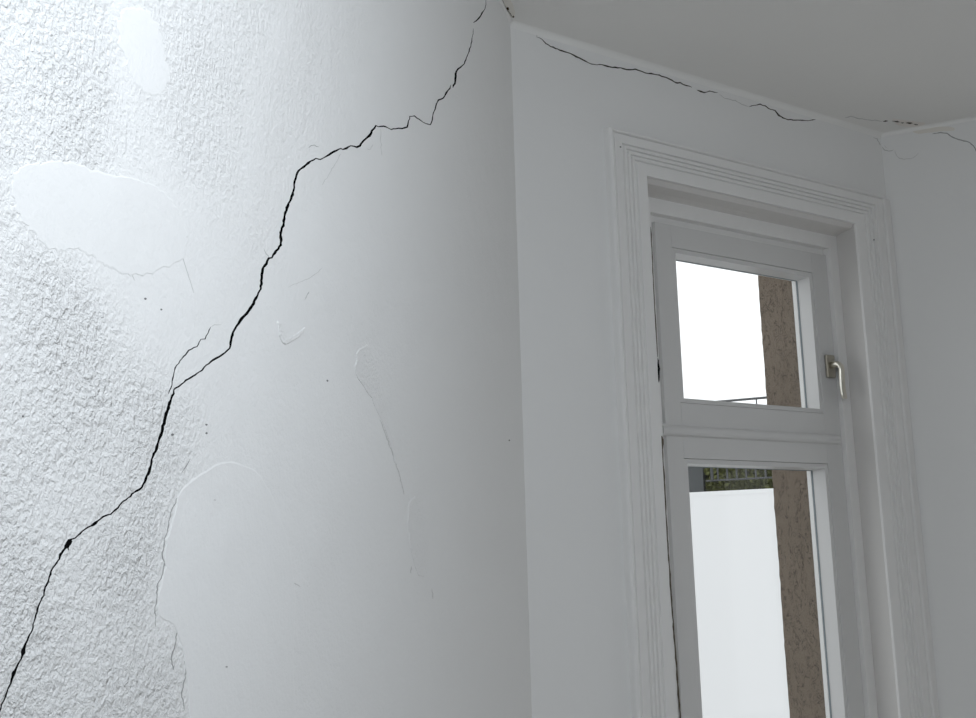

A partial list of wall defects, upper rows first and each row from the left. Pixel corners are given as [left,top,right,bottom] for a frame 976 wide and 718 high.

crack [536,35,815,121]
crack [845,116,976,160]
crack [0,0,512,711]